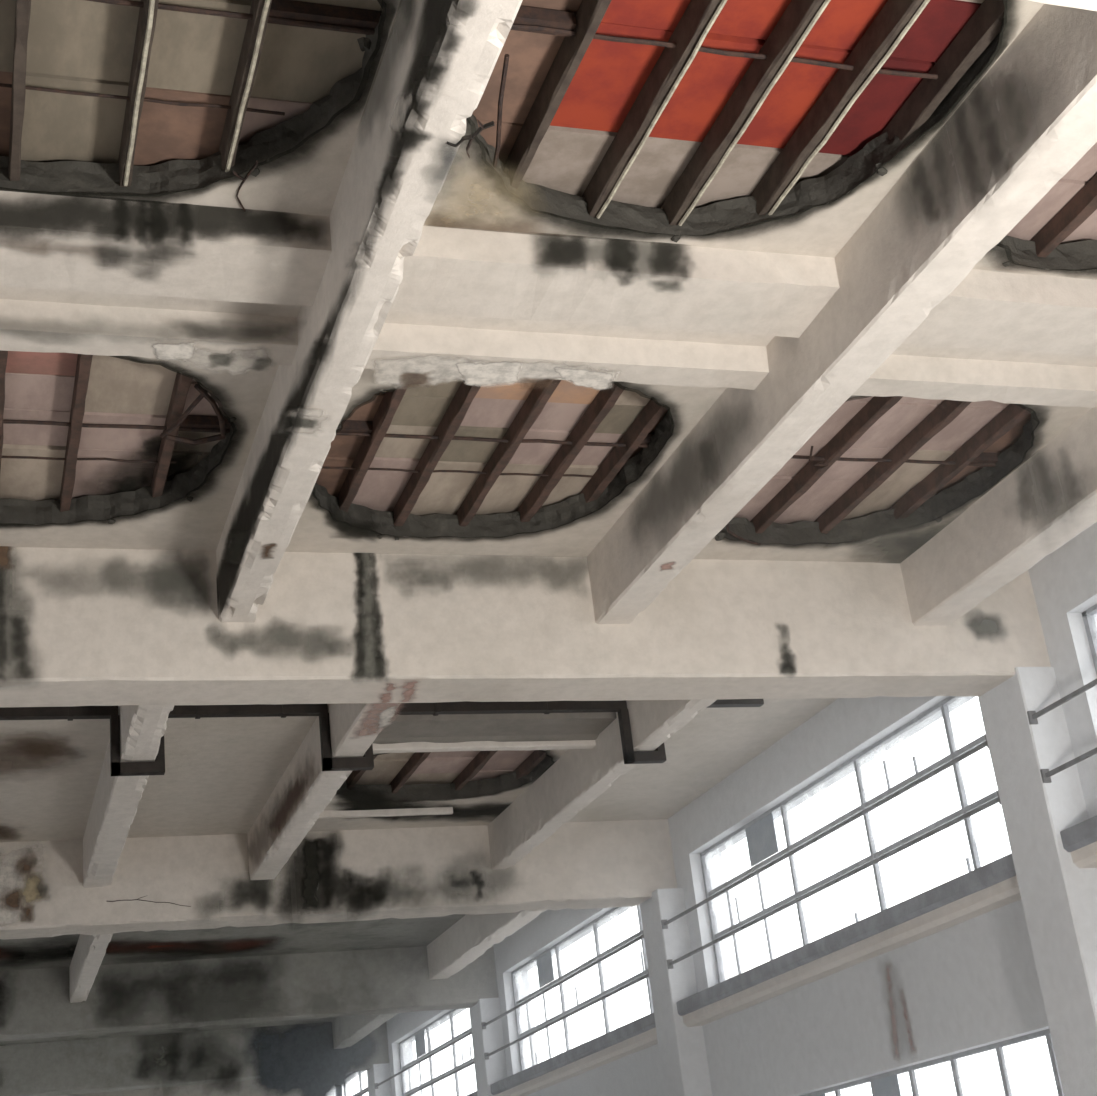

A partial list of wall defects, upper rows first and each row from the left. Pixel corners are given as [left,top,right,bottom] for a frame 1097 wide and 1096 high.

hole [0,0,396,203]
spalling [464,0,1016,243]
leakage [0,196,323,265]
spalling [988,142,1097,275]
spalling [0,343,270,528]
leakage [332,507,384,539]
spalling [309,356,679,541]
hole [715,395,1046,548]
leakage [0,546,30,680]
leakage [353,553,386,680]
leakage [207,834,413,916]
leakage [249,1022,377,1096]